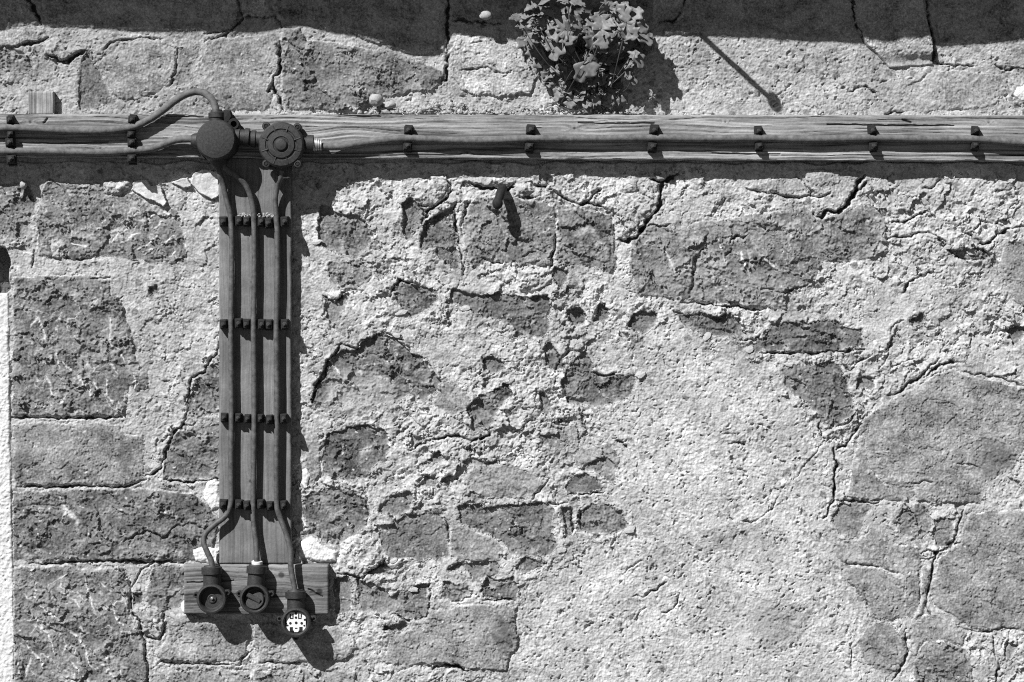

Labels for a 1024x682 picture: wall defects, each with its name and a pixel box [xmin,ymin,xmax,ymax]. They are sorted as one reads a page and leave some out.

spalling [311,204,376,257]
spalling [397,197,462,270]
crack [620,173,679,244]
crack [755,176,867,219]
crack [16,347,219,489]
spalling [310,332,441,409]
spalling [466,355,514,432]
spalling [393,267,646,407]
spalling [673,311,875,428]
crack [804,415,871,518]
spalling [303,424,635,634]
crack [918,517,961,615]